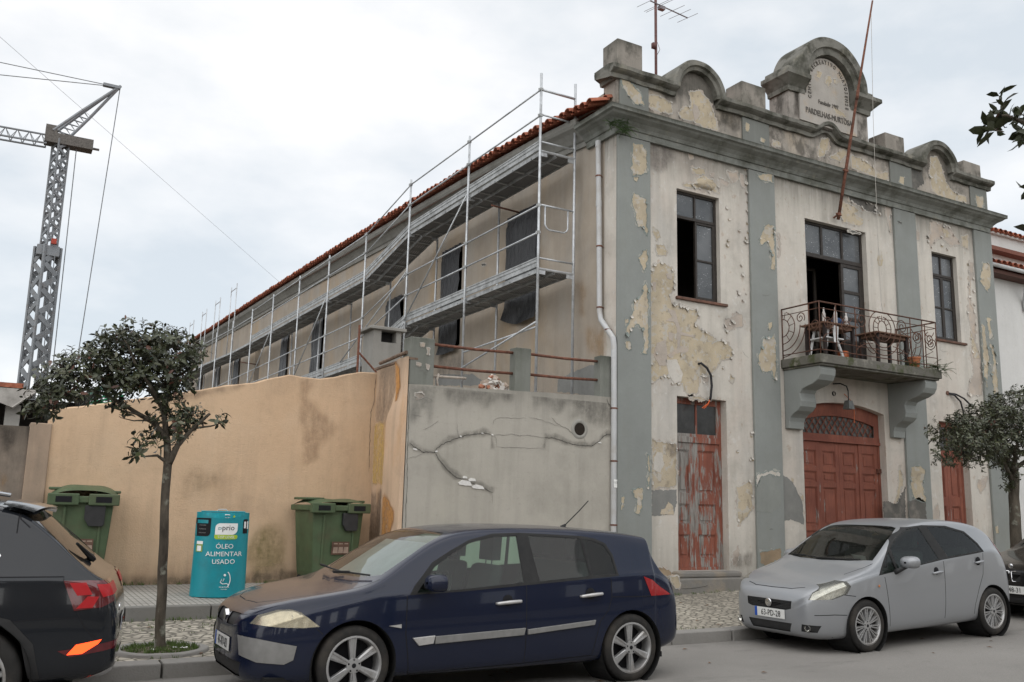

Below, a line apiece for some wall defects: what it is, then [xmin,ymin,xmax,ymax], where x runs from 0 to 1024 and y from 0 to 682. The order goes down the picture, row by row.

peeling [620,79,718,131]
peeling [682,154,782,272]
peeling [928,156,985,209]
peeling [624,142,747,403]
peeling [927,219,999,397]
crack [369,370,611,528]
peeling [620,437,679,516]
peeling [735,450,781,527]
peeling [894,465,940,520]